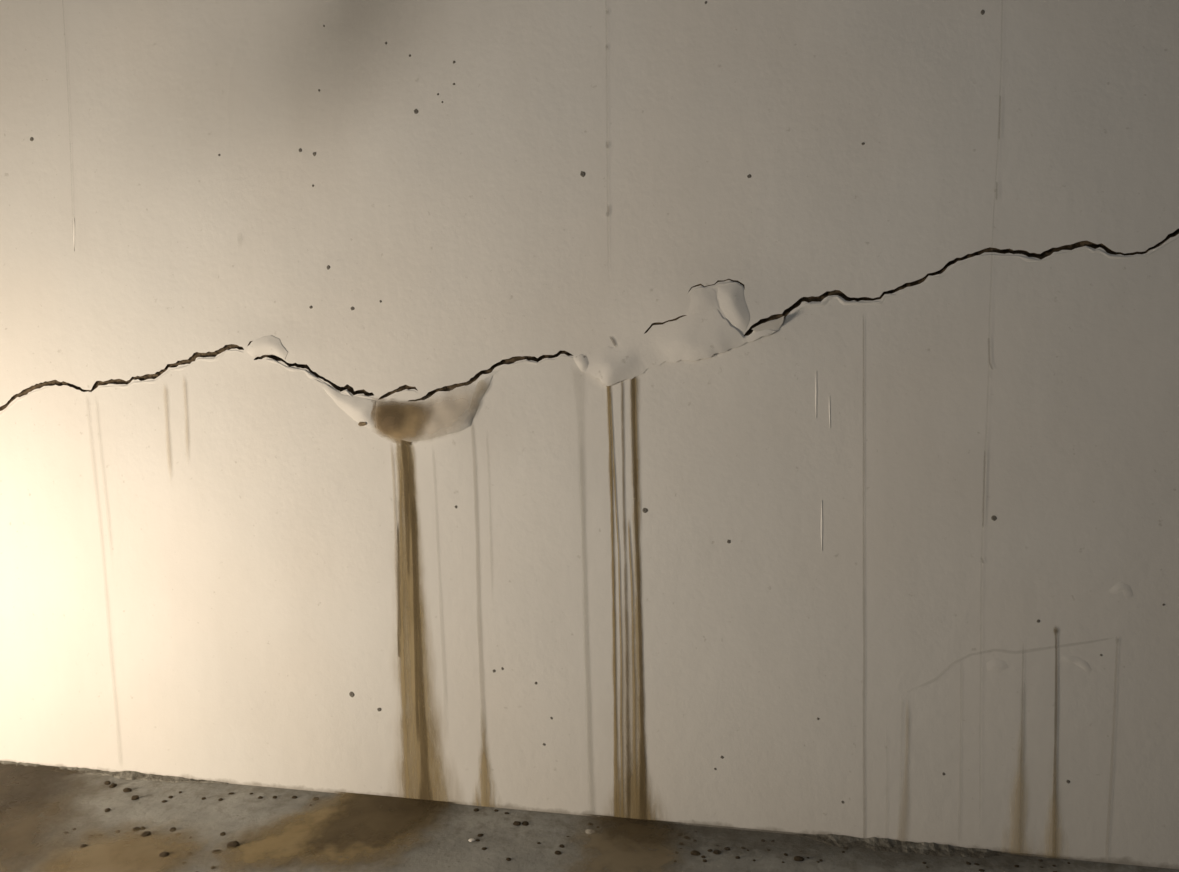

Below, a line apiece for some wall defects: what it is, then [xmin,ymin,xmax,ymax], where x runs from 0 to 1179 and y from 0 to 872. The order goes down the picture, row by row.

crack [0,341,574,417]
peeling [573,283,784,386]
crack [689,279,745,295]
crack [744,229,1179,336]